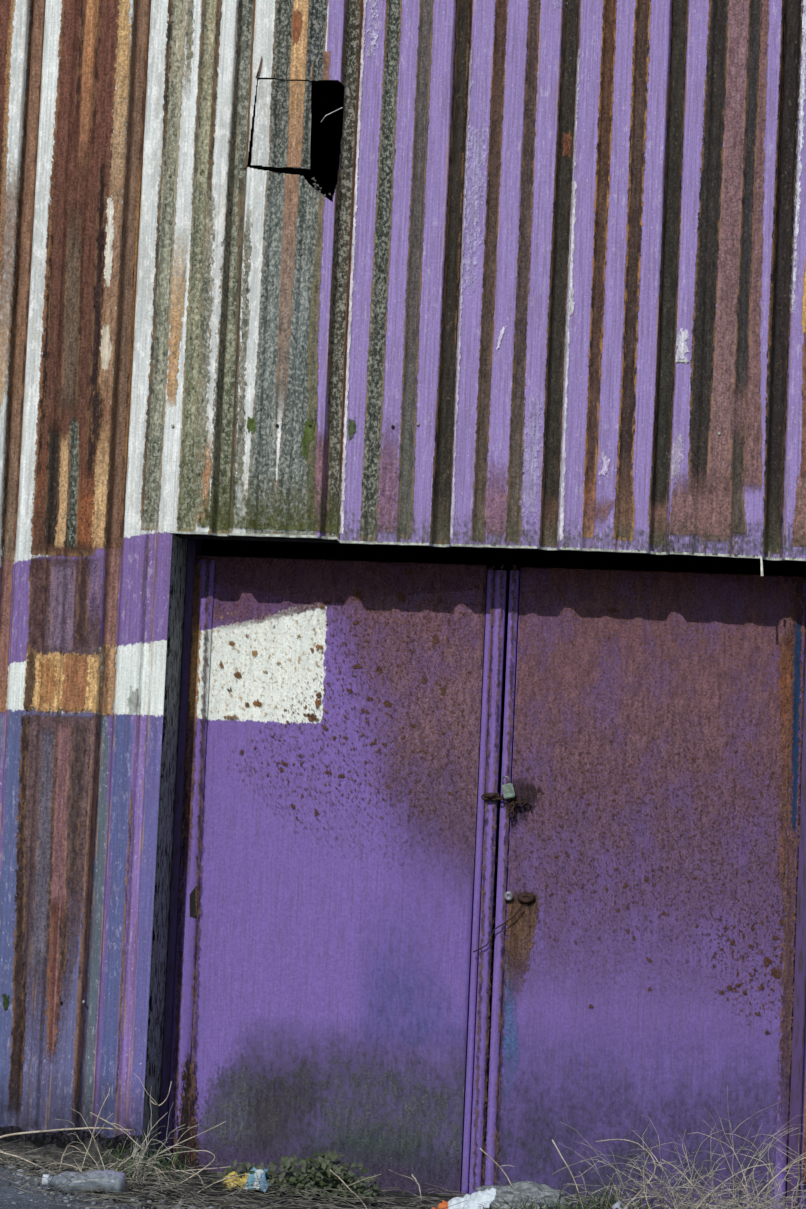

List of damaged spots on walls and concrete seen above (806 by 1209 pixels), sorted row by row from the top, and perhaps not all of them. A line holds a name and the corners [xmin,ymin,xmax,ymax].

rust [0,0,151,1120]
rust [197,442,212,524]
rust [275,174,299,411]
rust [289,0,309,80]
rust [313,0,364,539]
rust [376,0,434,540]
rust [429,0,473,545]
rust [470,0,541,543]
rust [538,0,581,547]
rust [170,555,806,1189]